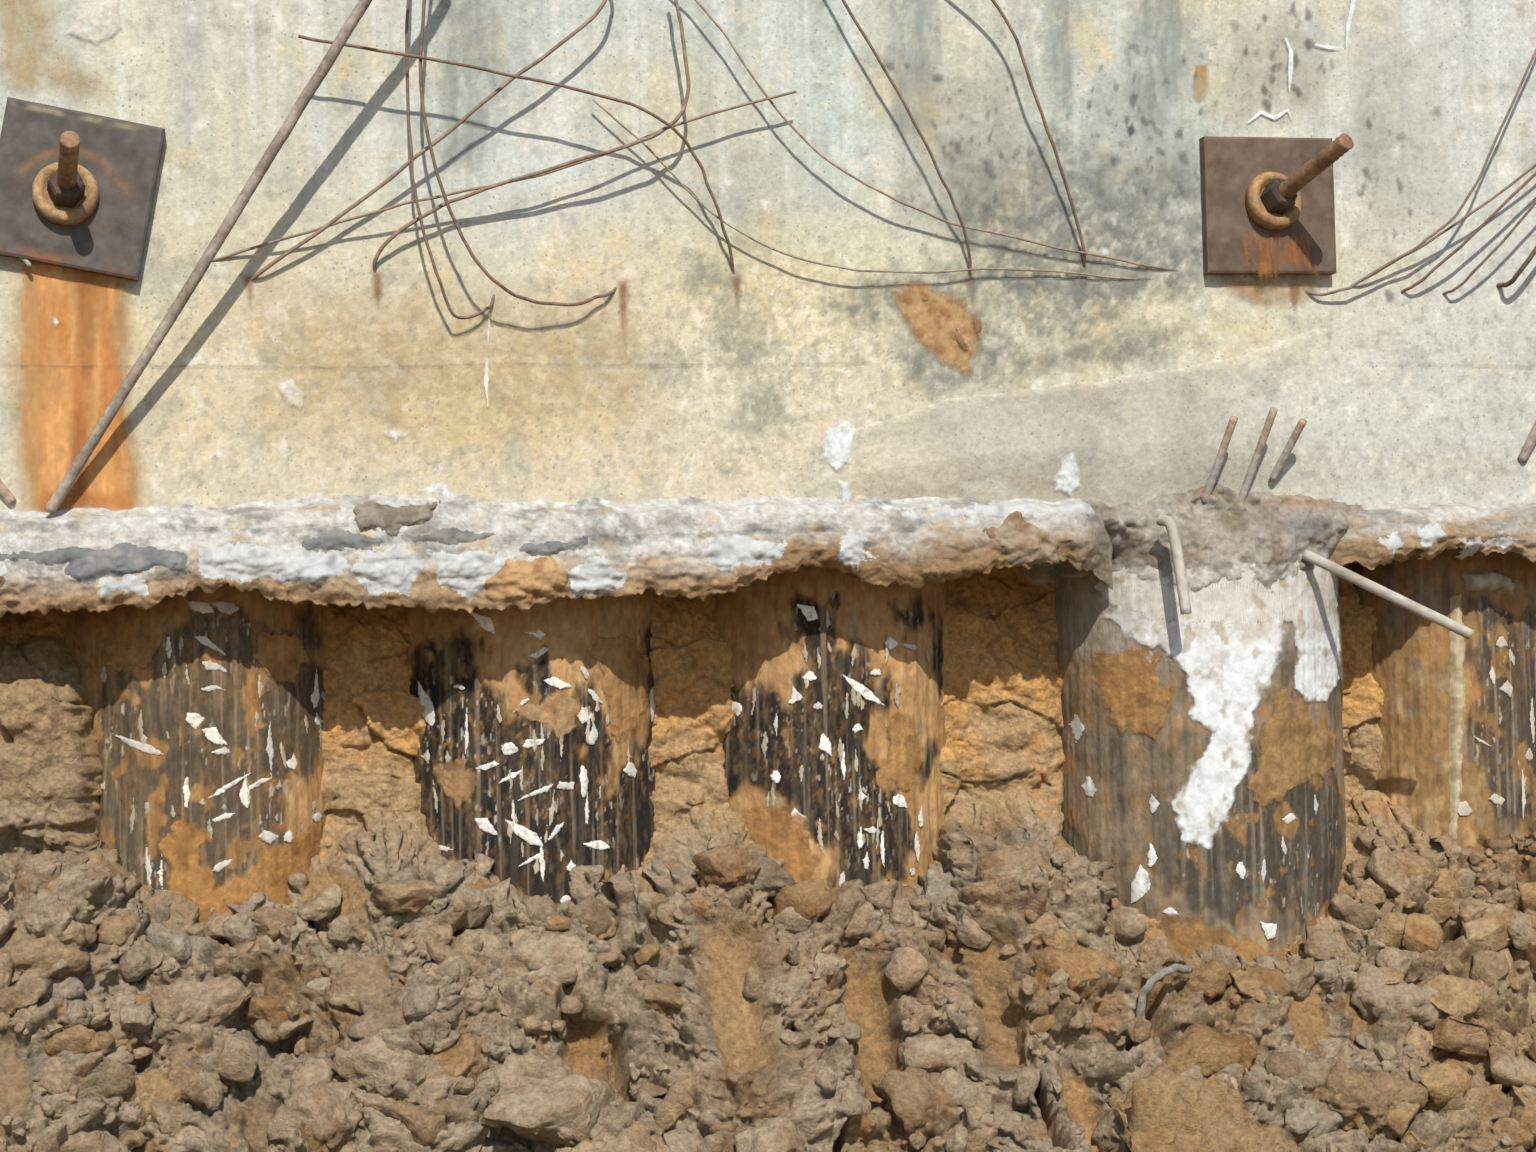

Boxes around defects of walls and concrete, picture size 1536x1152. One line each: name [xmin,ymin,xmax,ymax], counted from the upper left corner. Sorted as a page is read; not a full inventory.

corrosion [1236,236,1311,300]
spalling [895,283,982,371]
corrosion [17,262,137,512]
spalling [353,499,442,536]
spalling [982,511,1060,567]
spalling [471,556,569,634]
leakage [1095,560,1341,848]